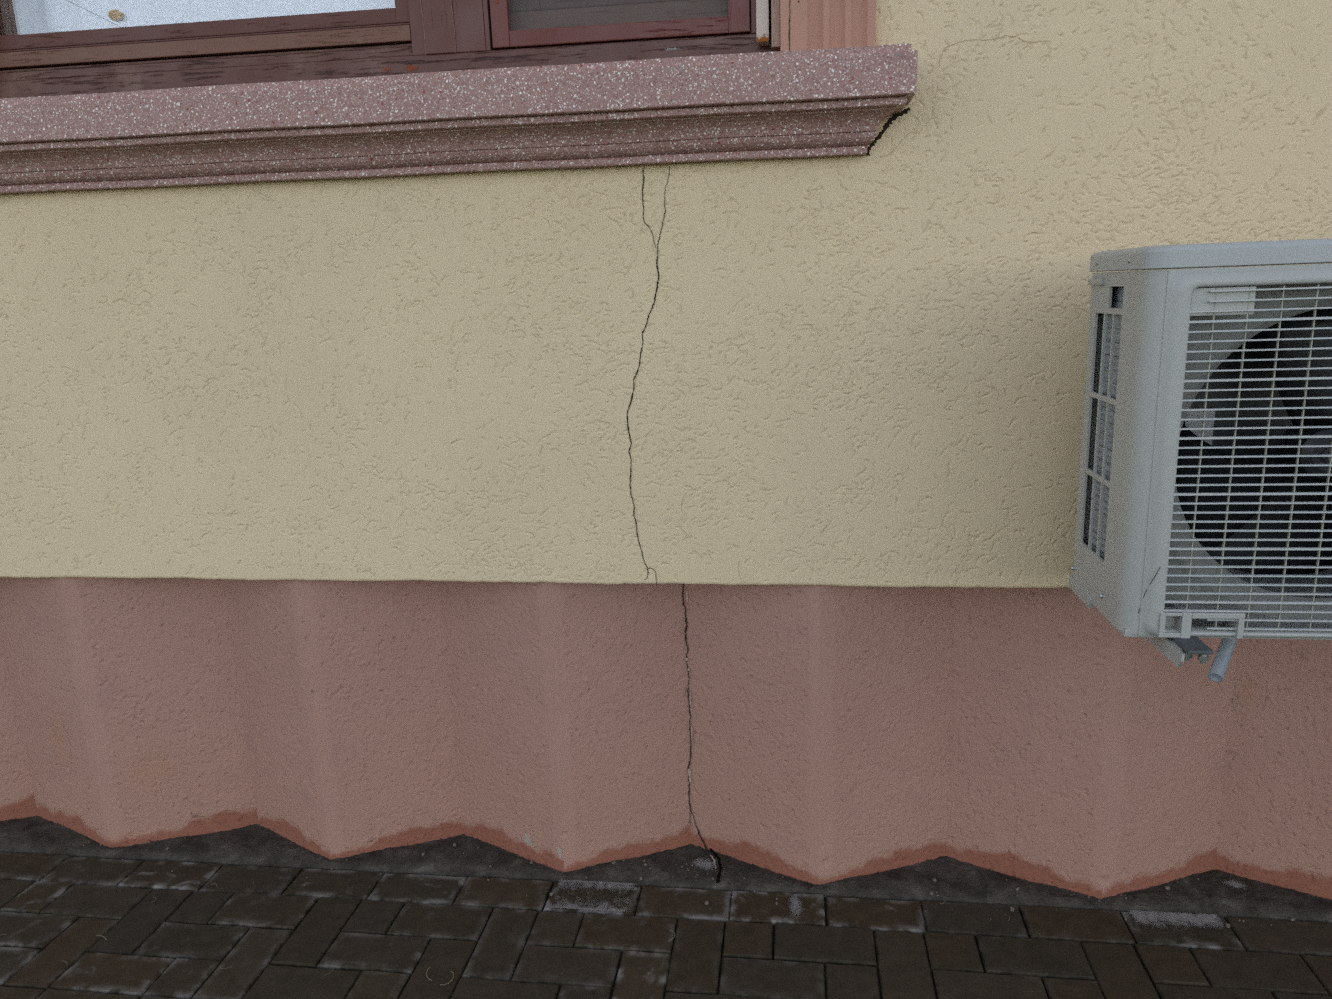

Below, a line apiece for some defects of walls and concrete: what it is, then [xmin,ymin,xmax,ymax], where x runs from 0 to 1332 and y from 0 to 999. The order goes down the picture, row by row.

crack [627,167,708,850]